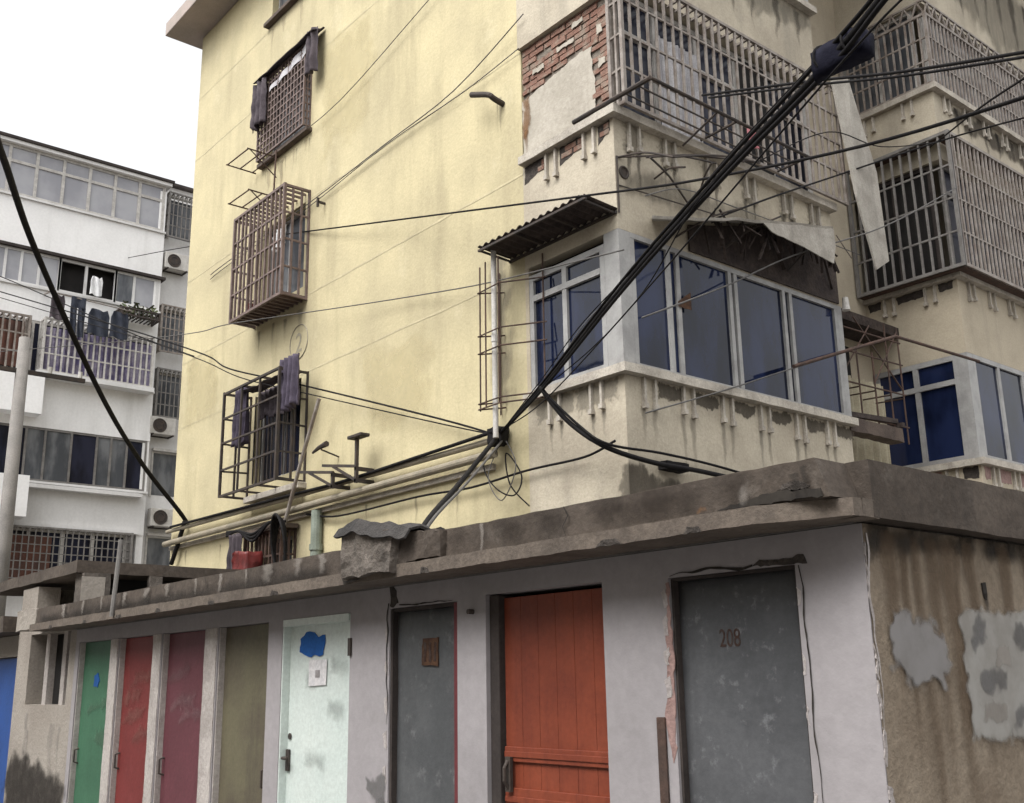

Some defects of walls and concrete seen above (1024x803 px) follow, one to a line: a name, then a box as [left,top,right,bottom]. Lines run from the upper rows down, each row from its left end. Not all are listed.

flaking render [522,0,610,185]
damp [658,382,682,401]
damp [695,392,719,411]
damp [734,401,755,419]
damp [771,410,792,426]
damp [806,417,854,440]
spalling [717,466,823,512]
damp [868,523,1024,560]
flaking render [660,554,823,803]
damp [5,754,63,803]